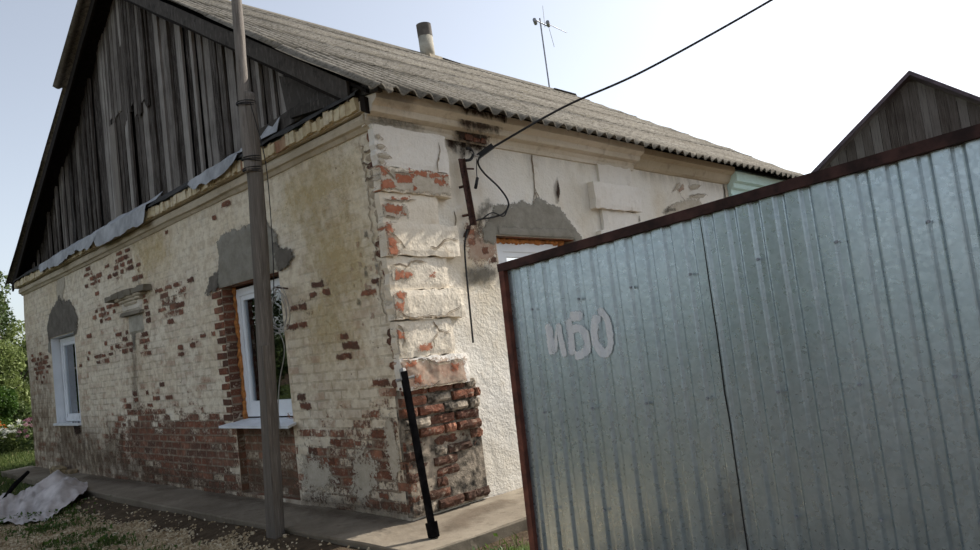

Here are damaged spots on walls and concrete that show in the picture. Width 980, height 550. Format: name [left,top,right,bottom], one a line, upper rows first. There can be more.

damp [448,104,507,158]
spalling [665,183,705,215]
peeling [463,218,498,267]
peeling [79,248,194,367]
spalling [287,133,491,519]